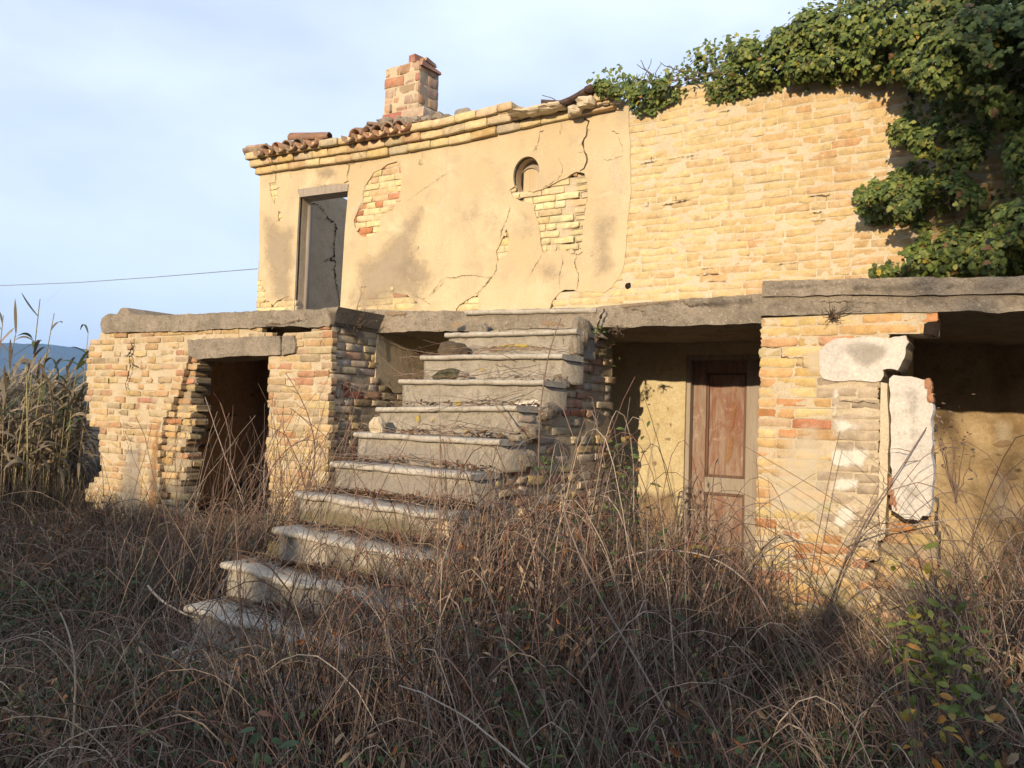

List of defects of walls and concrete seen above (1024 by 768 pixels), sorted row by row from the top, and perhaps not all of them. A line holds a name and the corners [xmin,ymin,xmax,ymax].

crack [534,119,623,188]
crack [312,144,356,305]
flaking render [354,162,402,237]
flaking render [511,173,588,255]
crack [414,263,497,304]